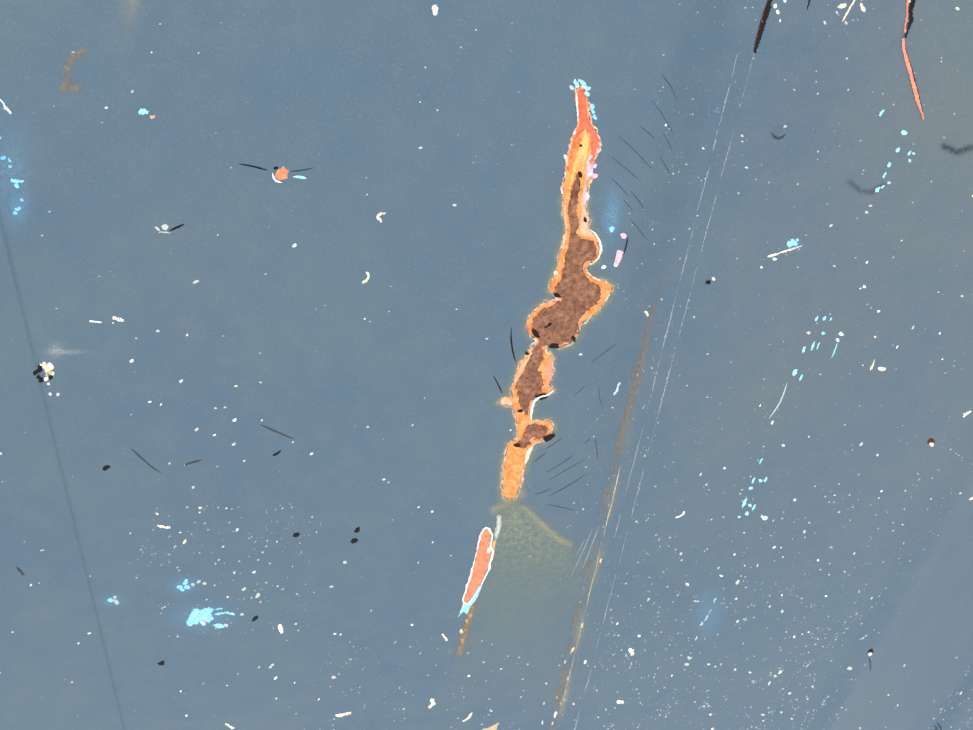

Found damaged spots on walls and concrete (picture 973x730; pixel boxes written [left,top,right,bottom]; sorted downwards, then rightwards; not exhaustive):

peeling [493,79,628,503]
peeling [457,515,502,654]